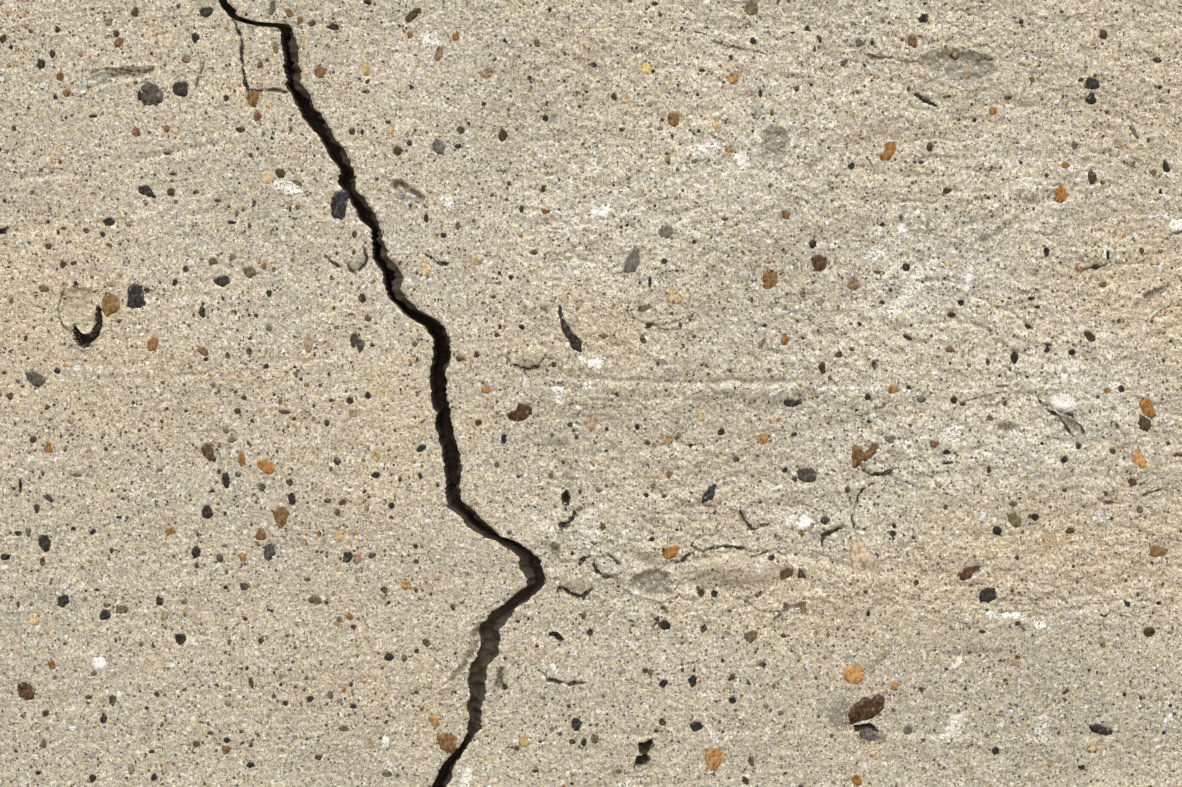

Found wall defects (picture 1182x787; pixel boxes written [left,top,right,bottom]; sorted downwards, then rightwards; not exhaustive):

crack [219,0,621,787]